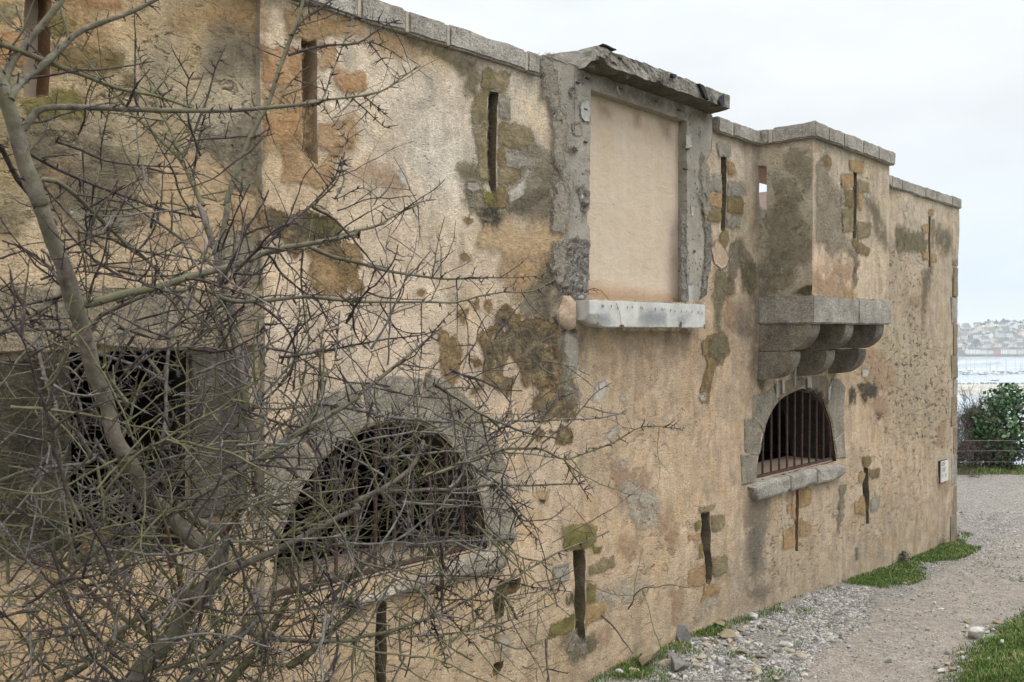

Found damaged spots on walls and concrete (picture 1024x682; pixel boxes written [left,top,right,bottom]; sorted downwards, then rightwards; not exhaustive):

flaking render [258,10,367,189]
flaking render [467,66,591,300]
spalling [680,141,746,303]
leakage [699,148,860,404]
flaking render [816,154,887,257]
leakage [895,225,951,253]
flaking render [688,504,725,541]
flaking render [783,488,812,549]
flaking render [855,497,880,515]
flaking render [859,456,880,483]
flaking render [548,523,616,656]
flaking render [688,554,728,602]